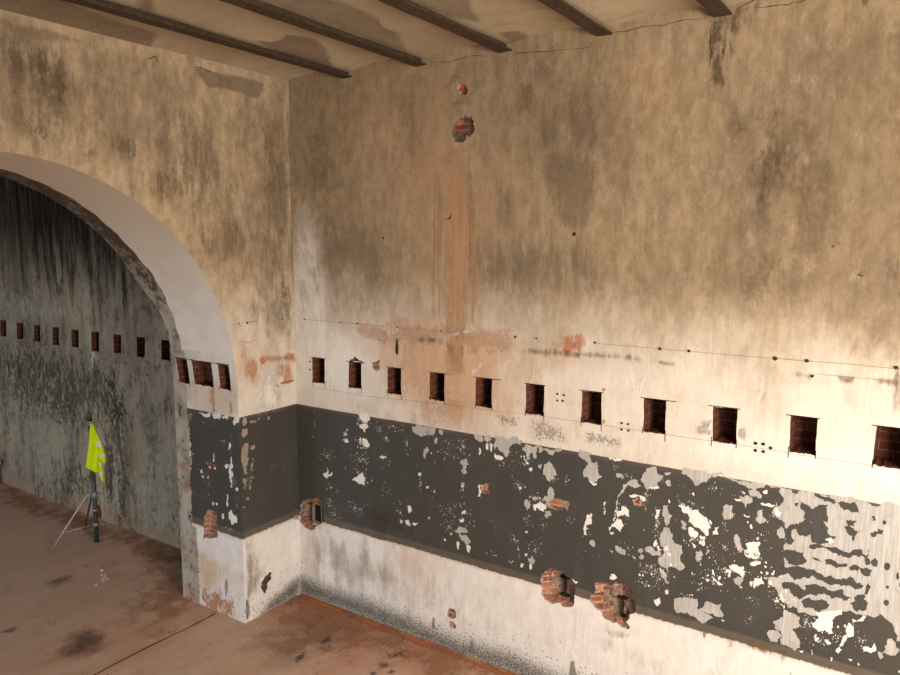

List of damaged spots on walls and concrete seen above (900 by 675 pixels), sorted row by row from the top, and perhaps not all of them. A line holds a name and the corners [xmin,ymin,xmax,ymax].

damp [198,70,262,97]
damp [260,35,331,66]
crack [613,17,713,68]
damp [712,11,739,84]
corrosion [564,336,582,355]
damp [3,347,129,526]
peeling [186,412,270,539]
spalling [294,498,341,530]
peeling [343,413,601,569]
damp [246,557,556,675]
spalling [540,568,578,607]
peeling [590,456,900,661]